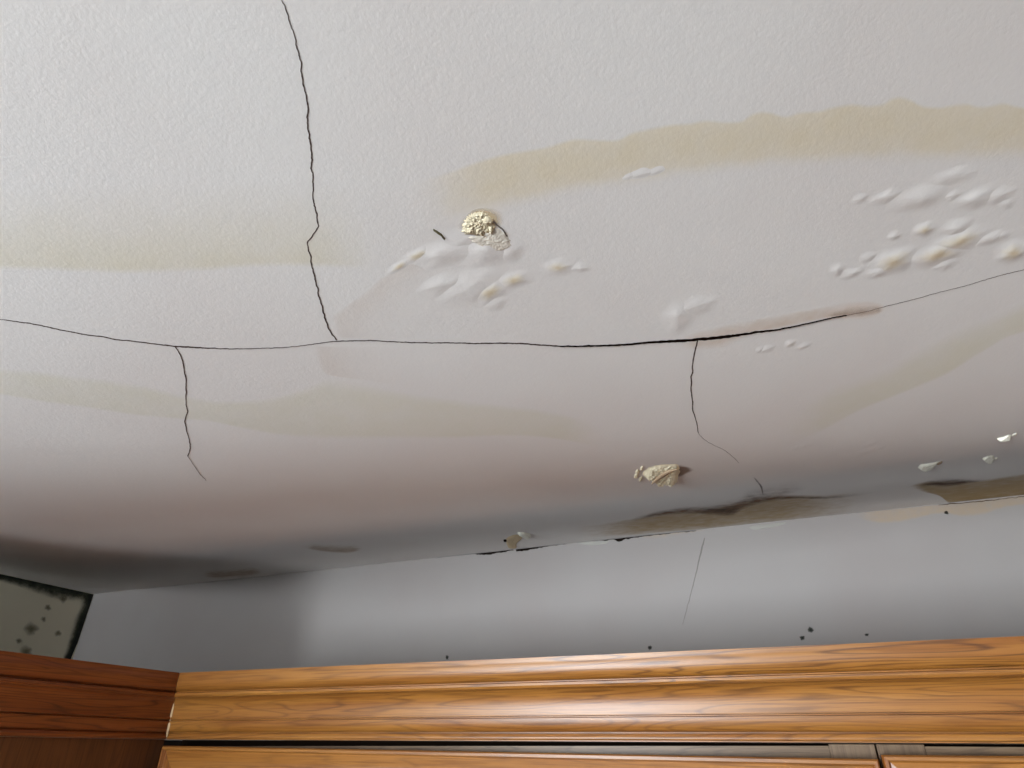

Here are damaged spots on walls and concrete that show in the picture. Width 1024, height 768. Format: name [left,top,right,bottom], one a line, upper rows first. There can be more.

spalling [461,211,511,251]
crack [0,0,1023,480]
leakage [0,95,1024,456]
spalling [634,464,695,487]
leakage [550,473,1024,541]
peeling [918,461,942,472]
mould [0,574,94,659]